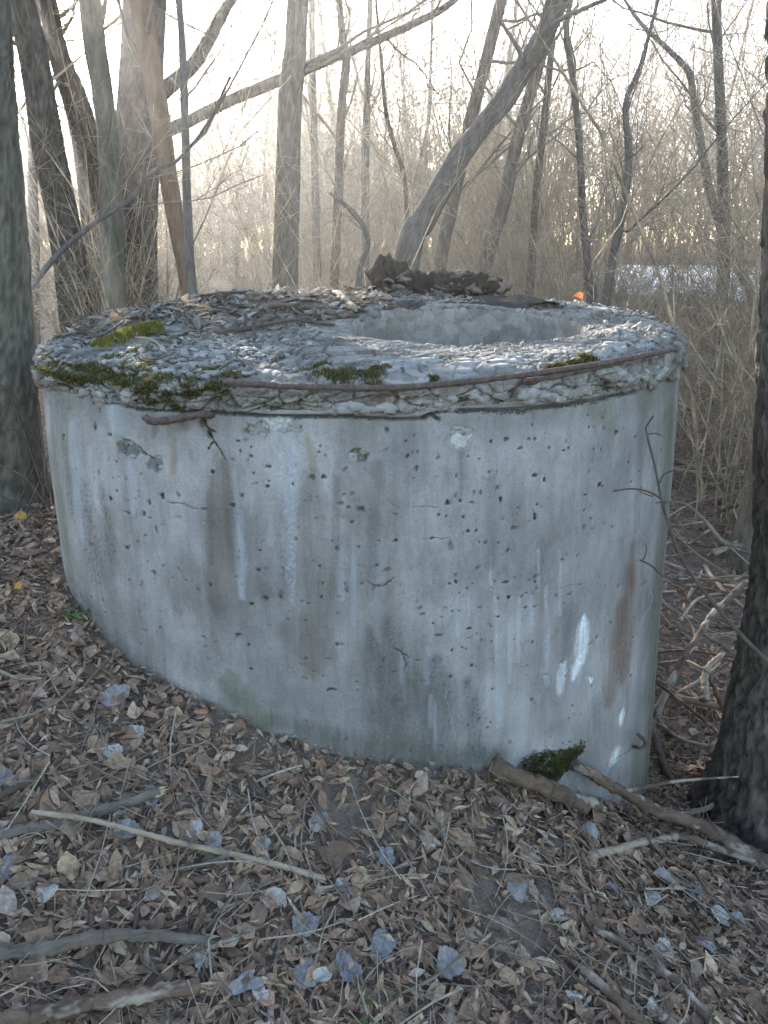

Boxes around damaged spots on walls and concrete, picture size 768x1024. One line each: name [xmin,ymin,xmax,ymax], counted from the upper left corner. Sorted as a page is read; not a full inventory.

spalling [94,426,164,471]
spalling [450,426,480,459]
spalling [109,477,186,549]
leakage [572,616,592,684]